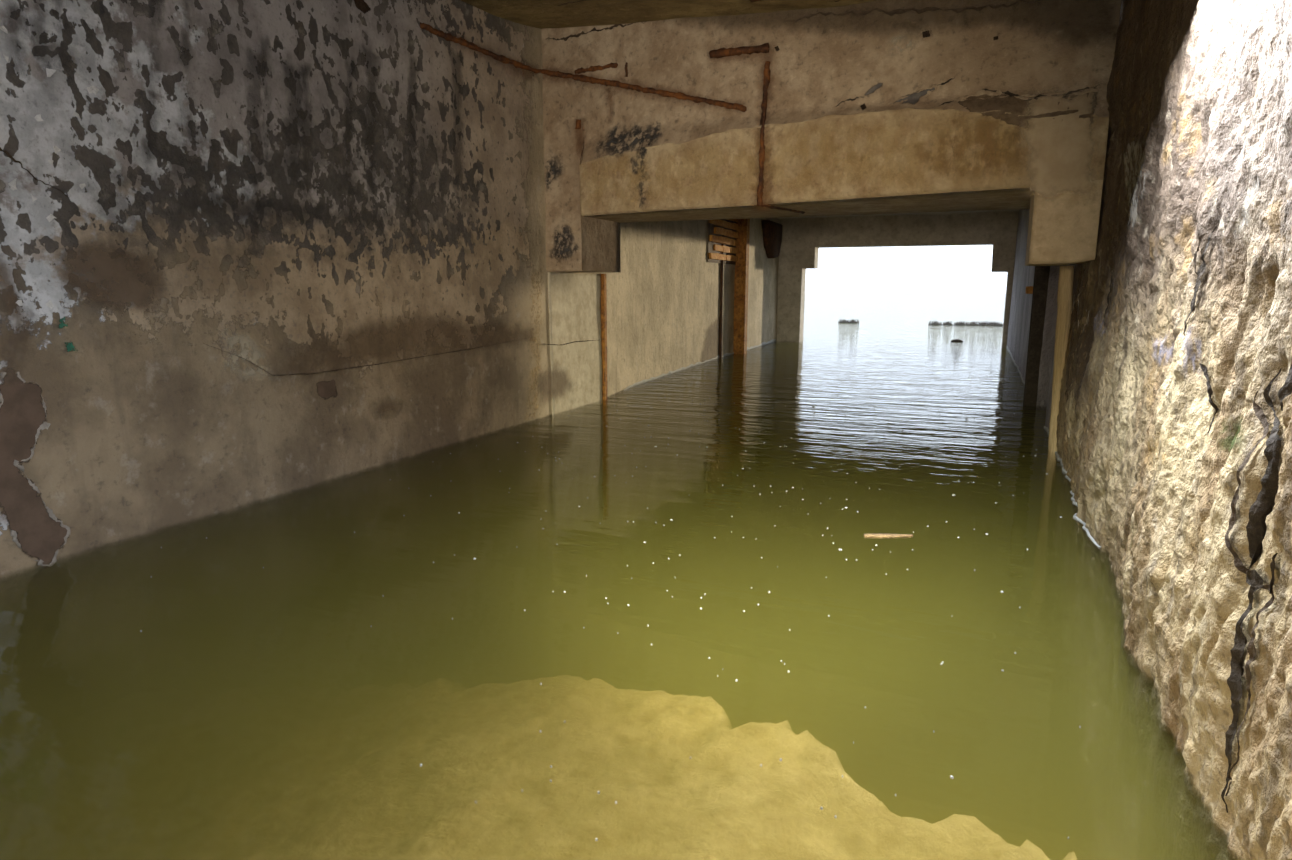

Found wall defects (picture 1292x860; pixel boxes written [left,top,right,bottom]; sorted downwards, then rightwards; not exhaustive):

leakage [62,244,160,308]
peeling [0,0,534,379]
crack [1183,226,1217,336]
spalling [0,360,71,568]
crack [1199,363,1219,433]
crack [1221,365,1292,813]